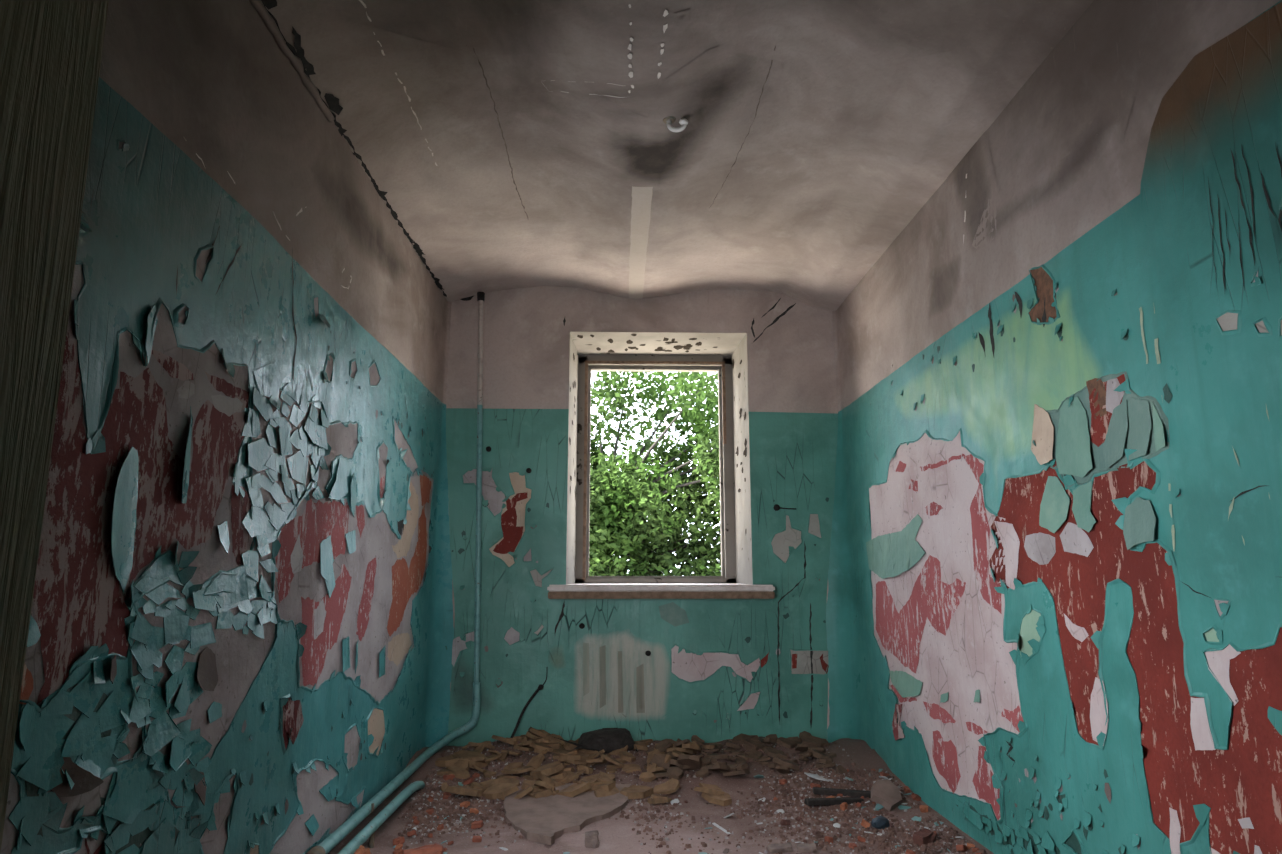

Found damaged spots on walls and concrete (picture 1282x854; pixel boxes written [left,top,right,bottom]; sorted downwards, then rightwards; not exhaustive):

flaking render [249,0,347,136]
peeling [996,264,1063,341]
peeling [0,260,434,854]
peeling [461,467,533,568]
peeling [770,513,822,564]
peeling [866,371,1282,854]
peeling [670,644,769,712]